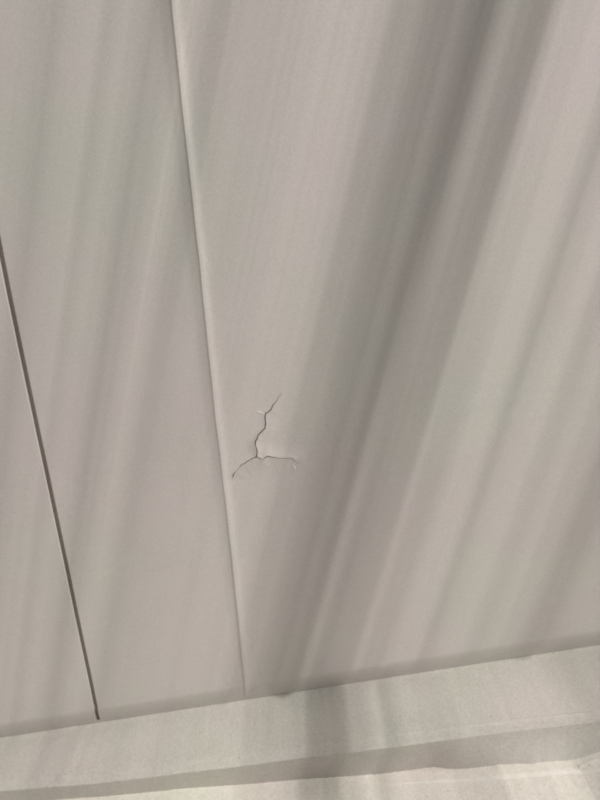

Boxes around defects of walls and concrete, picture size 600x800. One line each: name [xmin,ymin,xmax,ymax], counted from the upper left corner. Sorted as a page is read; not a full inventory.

crack [225,391,308,694]